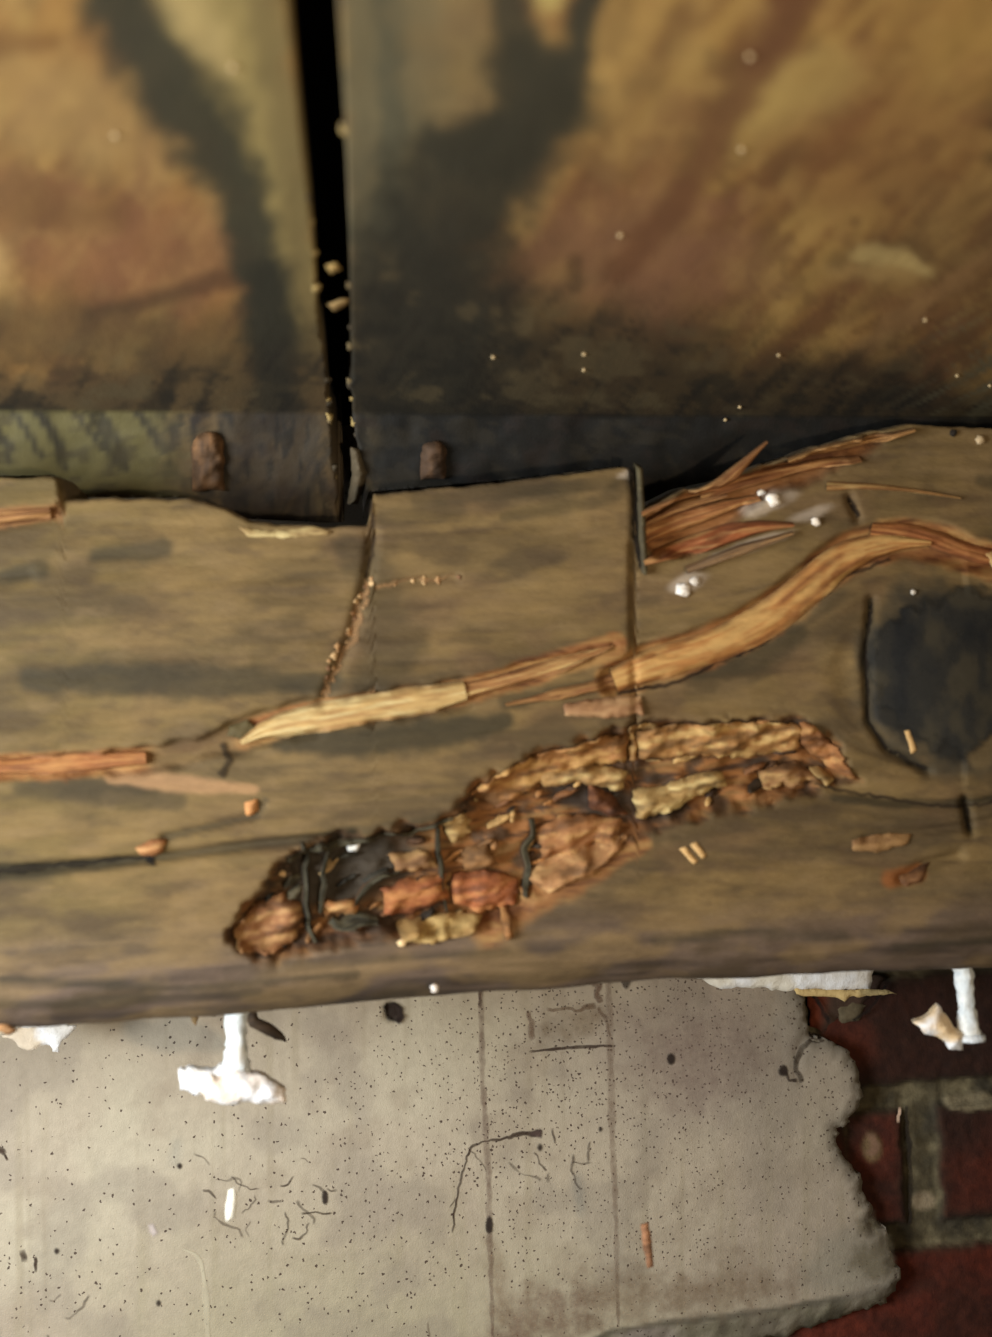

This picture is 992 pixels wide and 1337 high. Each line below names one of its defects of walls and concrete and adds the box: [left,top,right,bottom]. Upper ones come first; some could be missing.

crack [629,469,641,568]
crack [847,498,860,516]
crack [321,502,453,698]
crack [830,559,890,593]
crack [618,640,770,695]
crack [863,603,927,770]
crack [816,783,992,829]
spalling [794,974,895,1033]
peeling [0,1025,77,1052]
crack [451,1130,555,1231]